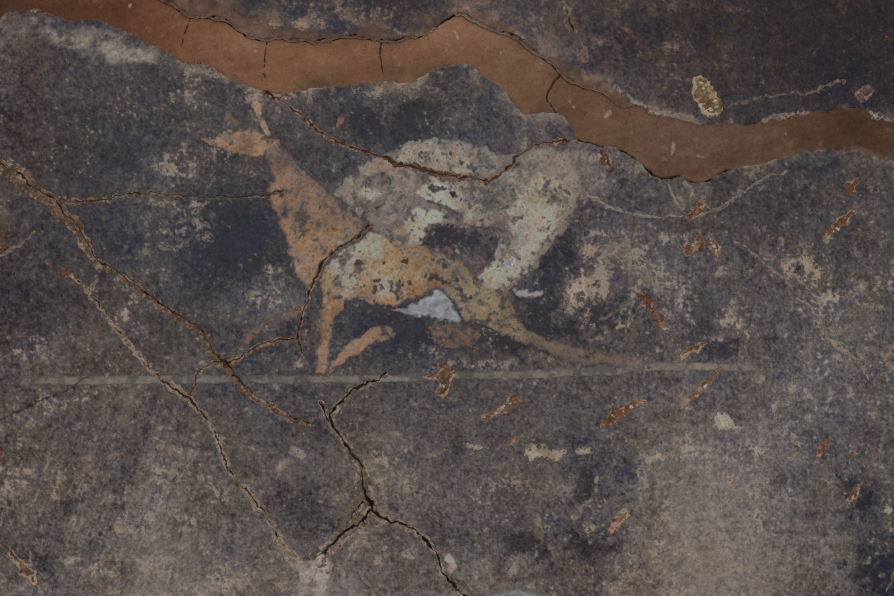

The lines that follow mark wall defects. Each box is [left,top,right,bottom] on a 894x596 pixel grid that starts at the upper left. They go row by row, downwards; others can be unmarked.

peeling [253,15,312,31]
peeling [181,59,223,84]
peeling [348,79,396,100]
peeling [608,80,662,117]
spalling [691,75,723,118]
peeling [761,109,812,124]
spalling [854,84,894,123]
crack [0,158,469,596]